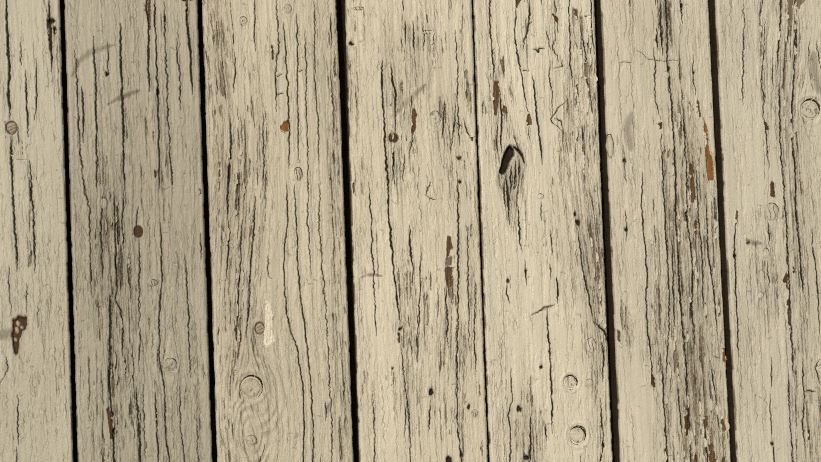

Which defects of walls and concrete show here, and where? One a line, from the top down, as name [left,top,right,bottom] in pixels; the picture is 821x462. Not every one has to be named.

peeling [445,236,455,287]
peeling [492,81,508,115]
crack [489,0,527,283]
crack [514,0,595,165]
crack [507,205,607,462]
peeling [651,100,731,462]